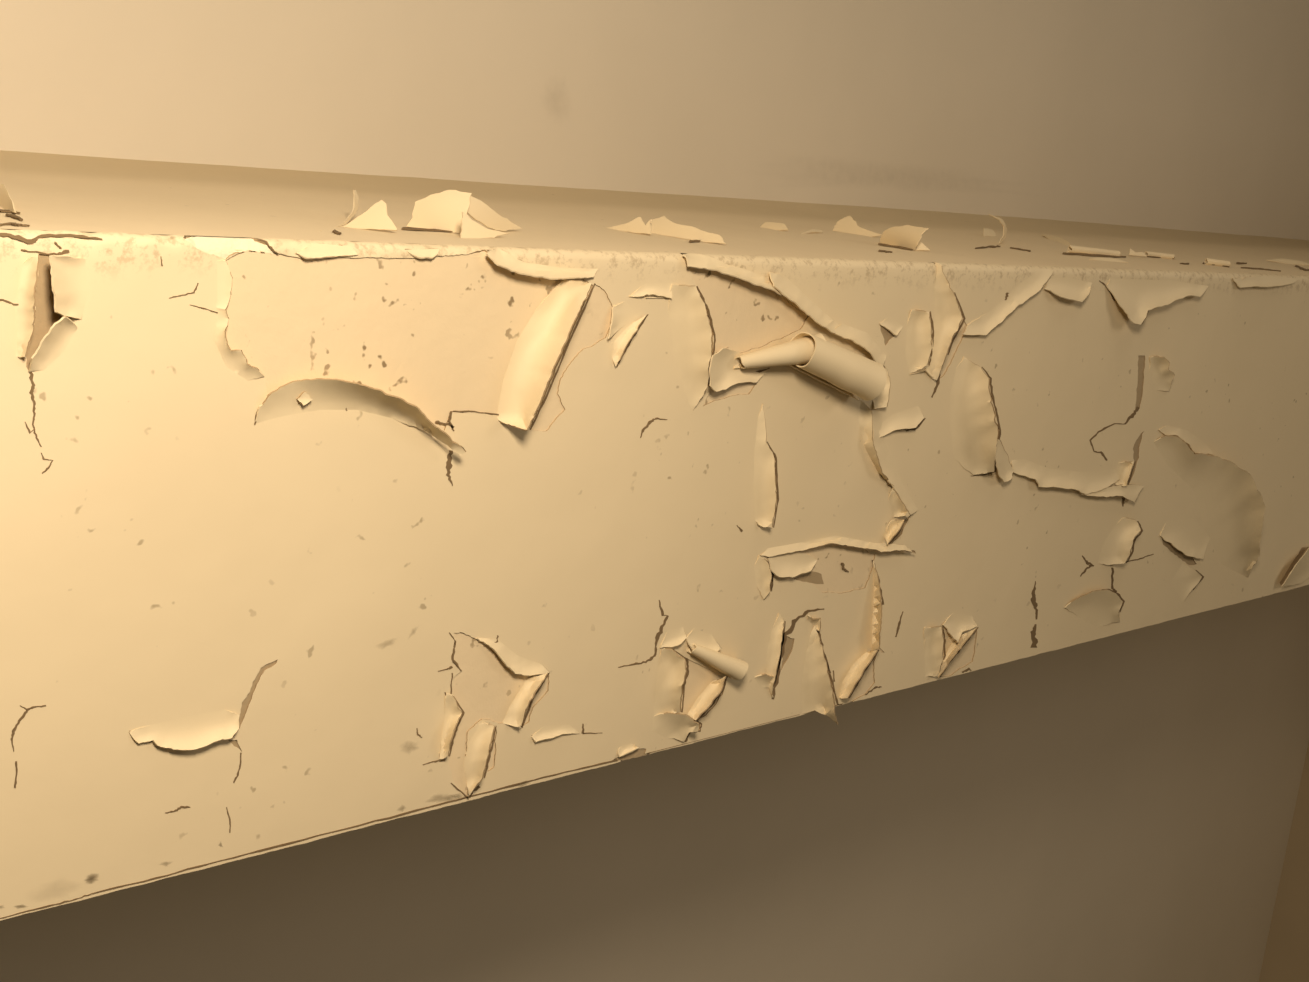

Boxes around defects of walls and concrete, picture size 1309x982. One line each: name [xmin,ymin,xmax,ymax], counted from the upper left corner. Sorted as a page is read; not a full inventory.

peeling [760,216,882,237]
peeling [1232,258,1309,288]
peeling [16,254,87,474]
peeling [183,190,839,486]
peeling [737,404,779,532]
peeling [754,262,1266,725]
crack [11,705,46,788]
peeling [129,660,277,783]
peeling [423,632,597,800]
peeling [614,744,649,760]
peeling [652,648,727,742]
crack [0,759,618,919]